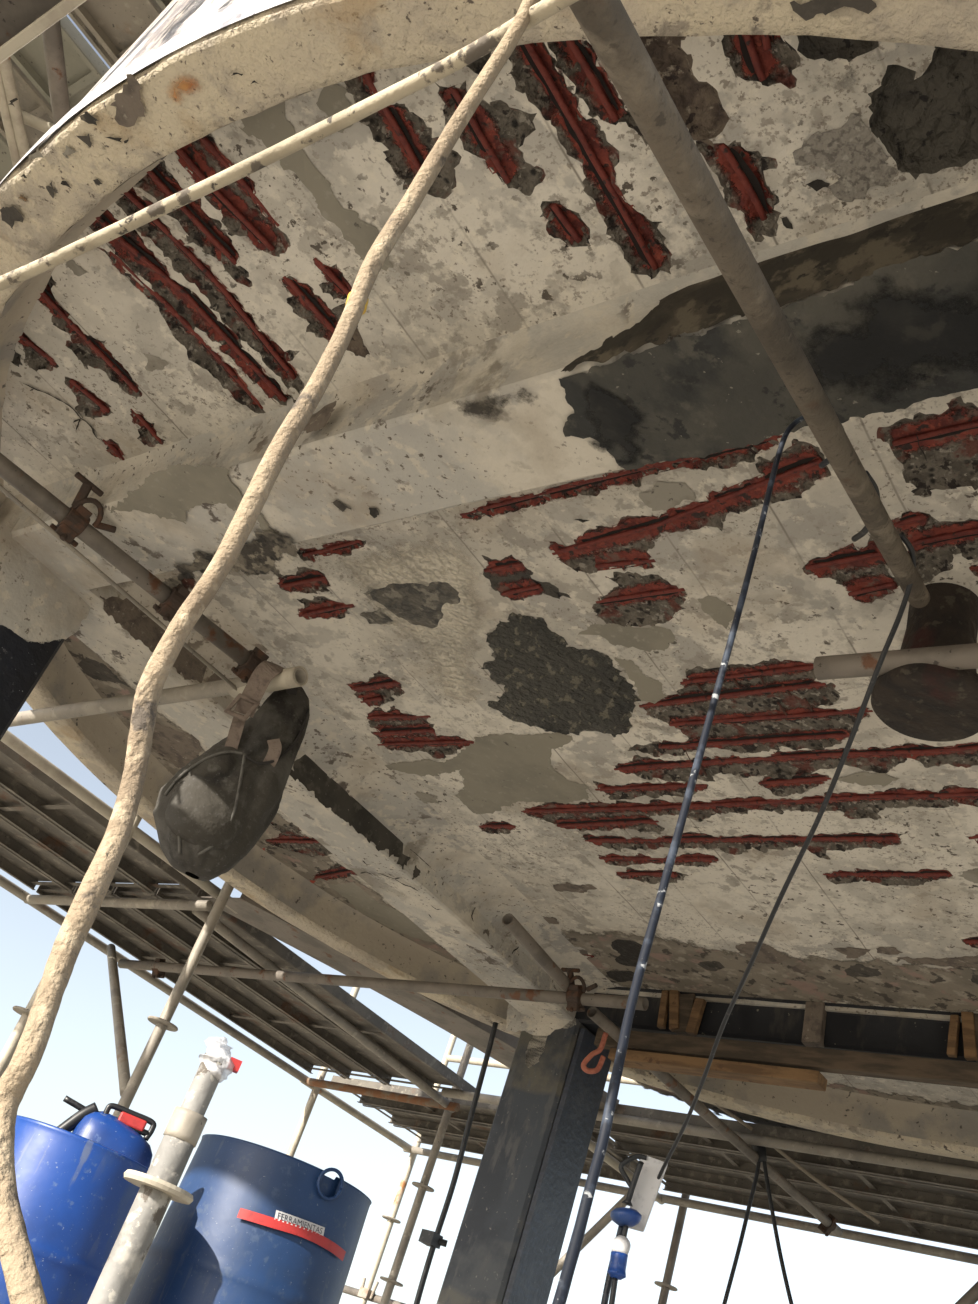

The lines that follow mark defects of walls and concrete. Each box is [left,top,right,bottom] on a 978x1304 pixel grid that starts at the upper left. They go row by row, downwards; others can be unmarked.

spalling [359,52,491,190]
spalling [427,40,672,279]
spalling [639,36,793,242]
spalling [721,0,879,89]
spalling [793,46,978,202]
spalling [89,134,304,414]
water stain [584,384,642,464]
peeling [460,319,831,627]
water stain [561,275,745,373]
water stain [758,192,978,401]
spalling [823,361,978,583]
spalling [479,658,978,886]